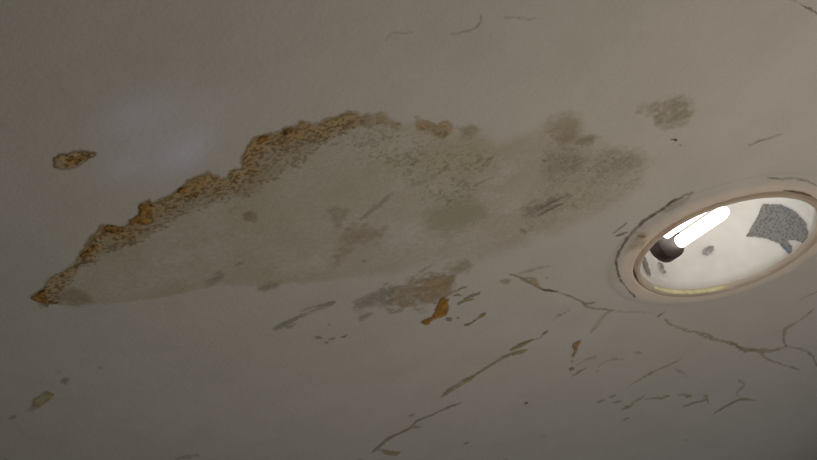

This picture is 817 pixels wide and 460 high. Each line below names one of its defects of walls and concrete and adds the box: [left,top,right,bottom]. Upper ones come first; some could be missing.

leakage [31,111,380,307]
crack [770,178,816,200]
crack [615,193,692,297]
leakage [356,262,468,318]
rust [421,298,449,325]
crack [502,275,608,310]
leakage [442,339,533,397]
crack [665,320,814,369]